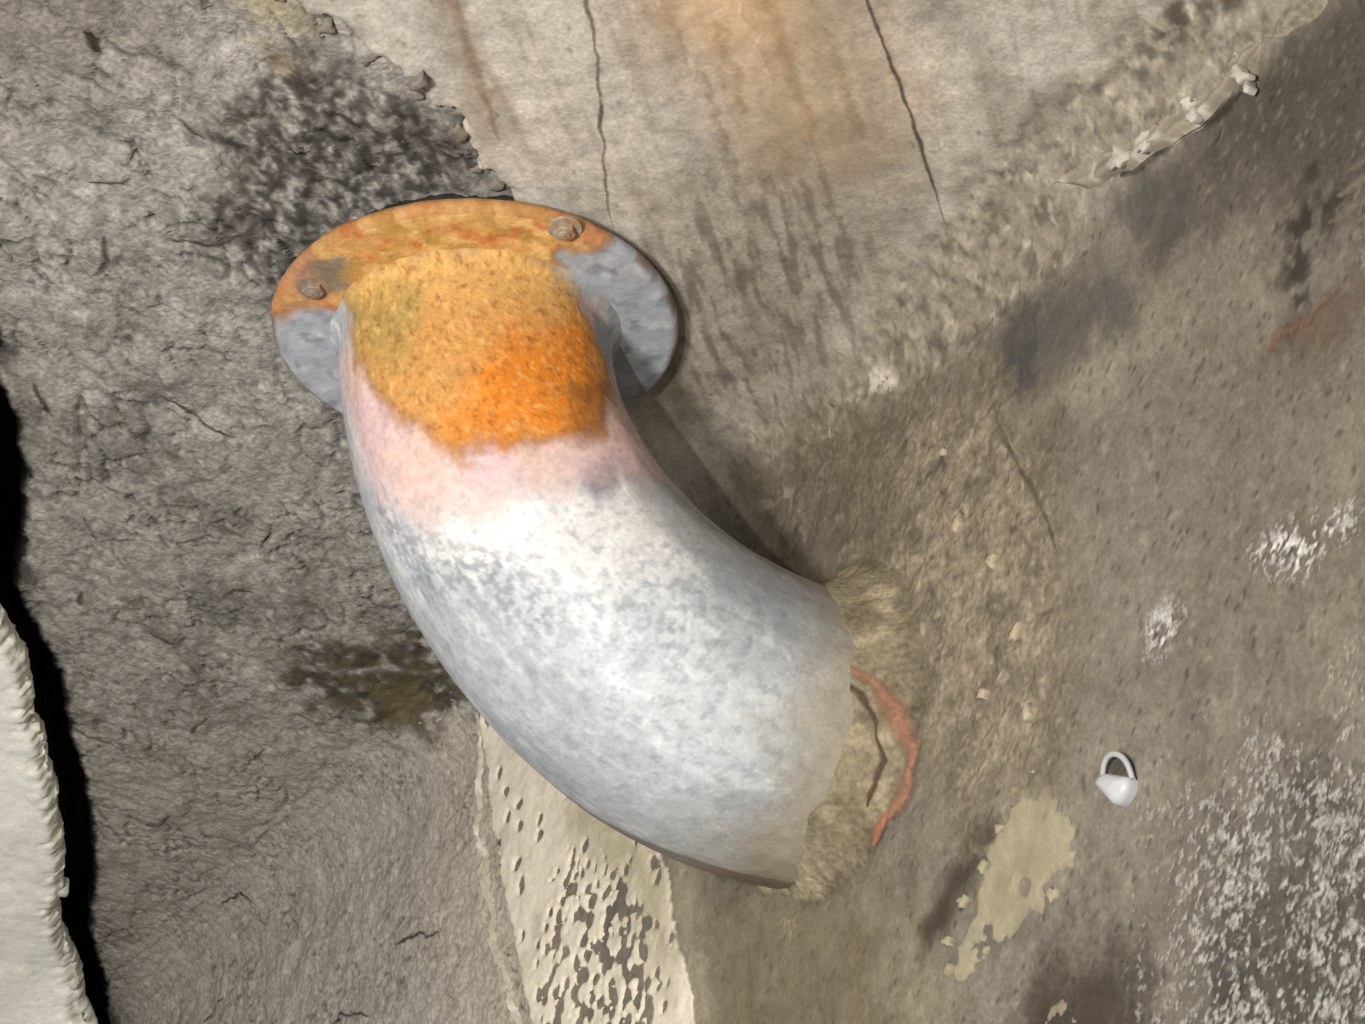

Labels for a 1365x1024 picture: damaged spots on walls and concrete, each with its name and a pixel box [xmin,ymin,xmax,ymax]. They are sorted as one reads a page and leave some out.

crack [83,31,100,53]
crack [584,0,613,228]
crack [866,0,946,225]
leakage [215,66,476,284]
crack [161,396,230,437]
flaking render [0,0,715,1024]
leakage [1255,505,1353,573]
peeling [976,859,990,875]
peeling [956,893,971,910]
leakage [1179,779,1365,1024]
crack [396,931,438,945]
peeling [941,936,954,947]